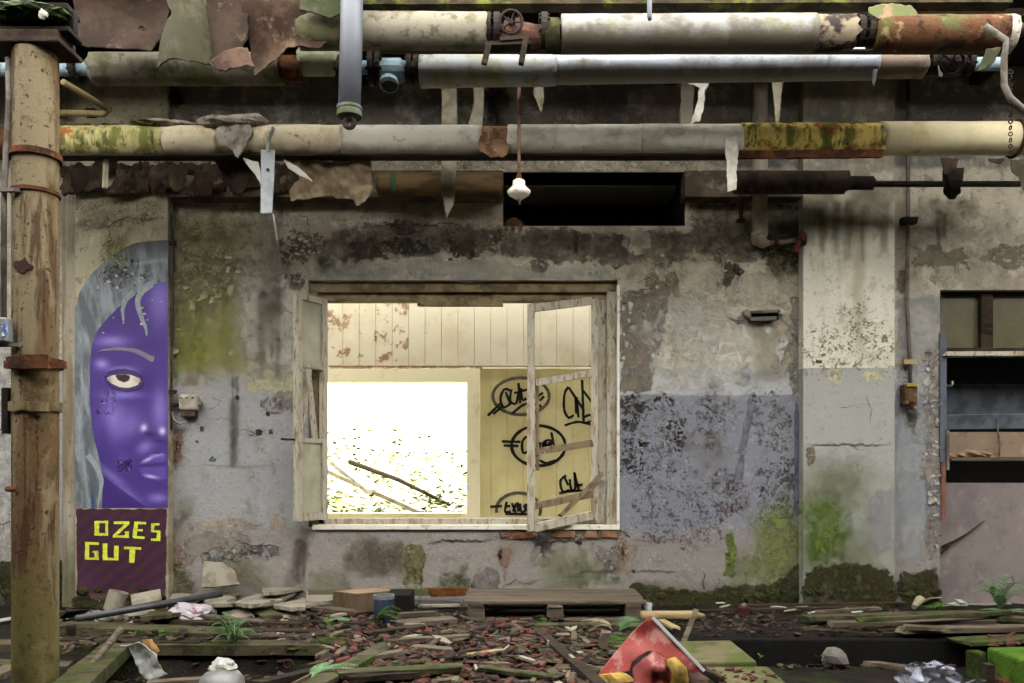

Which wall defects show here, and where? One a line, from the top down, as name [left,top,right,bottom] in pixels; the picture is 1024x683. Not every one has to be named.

rust [738,149,884,160]
rust [13,257,34,274]
leakage [318,203,799,281]
leakage [237,270,293,365]
peeling [328,303,409,362]
peeling [552,227,901,575]
crack [809,442,892,450]